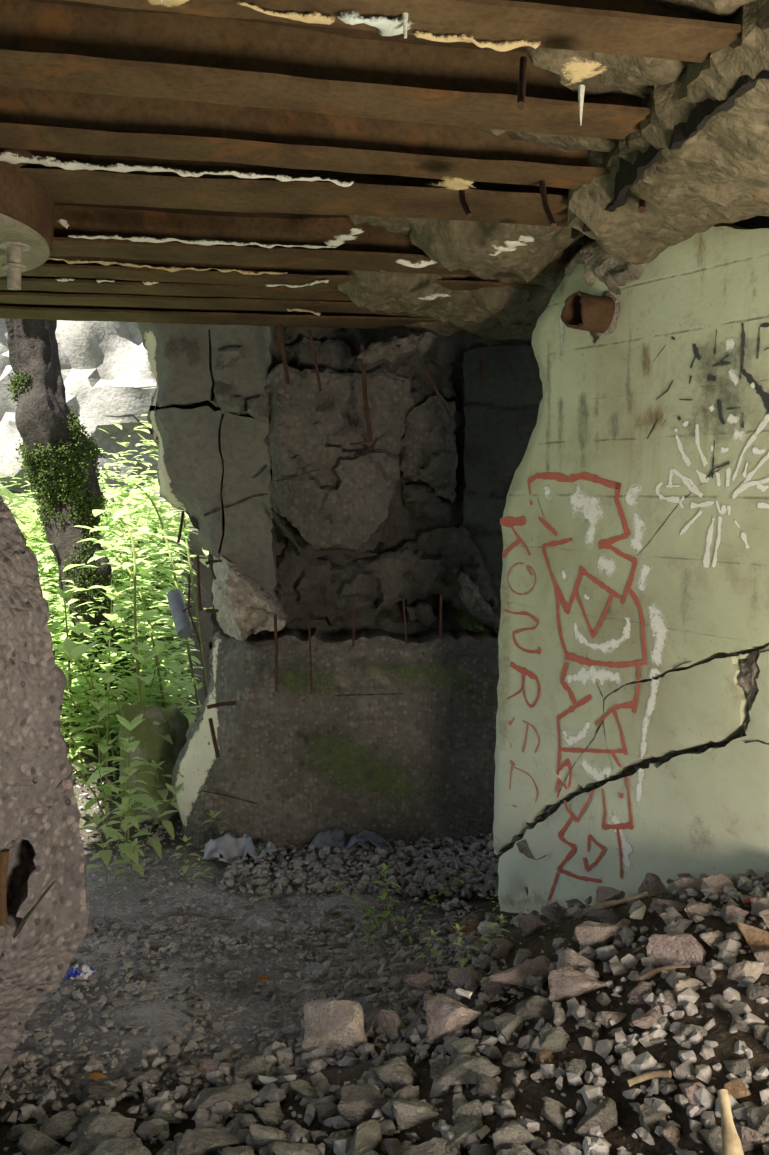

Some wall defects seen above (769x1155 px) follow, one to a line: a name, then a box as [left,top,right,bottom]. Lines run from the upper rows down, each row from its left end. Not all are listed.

damp [147,0,189,8]
damp [239,2,540,52]
spalling [649,0,756,23]
spalling [524,47,695,101]
damp [0,152,353,187]
spalling [479,128,619,153]
crack [571,70,769,240]
damp [57,219,364,249]
spalling [348,215,426,235]
spalling [374,227,648,340]
crack [106,360,377,562]
crack [495,645,769,860]